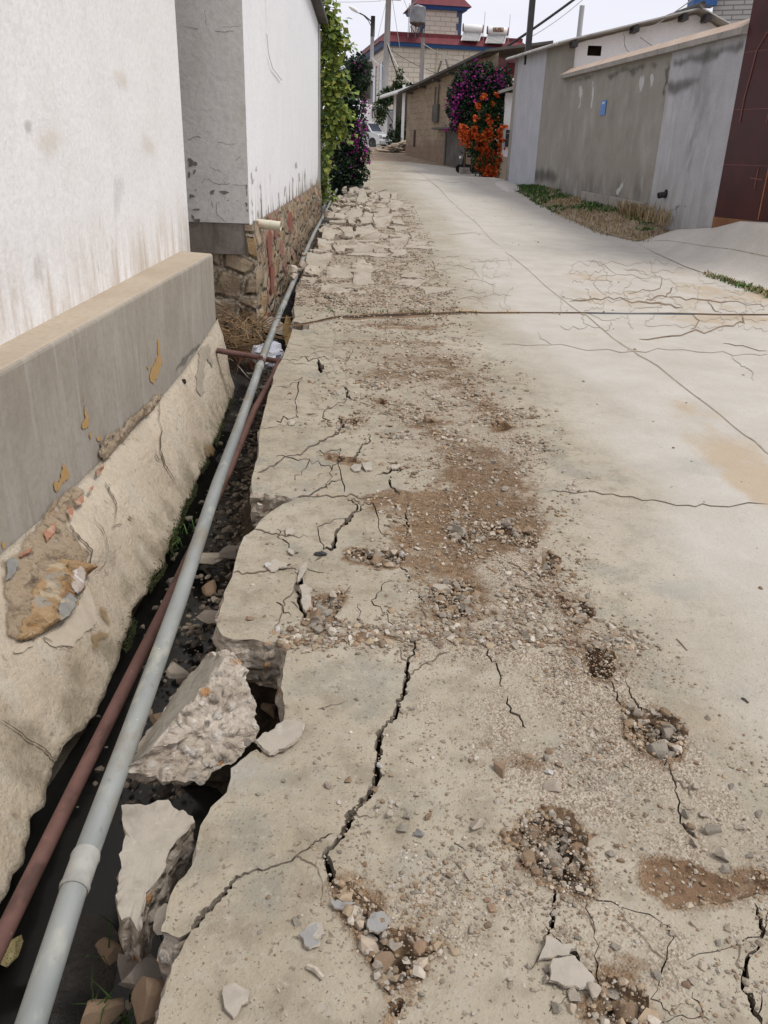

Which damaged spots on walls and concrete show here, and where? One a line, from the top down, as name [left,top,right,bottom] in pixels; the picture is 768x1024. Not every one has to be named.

crack [512,259,767,376]
spalling [2,339,162,640]
crack [551,490,765,507]
crack [191,232,511,930]
crack [529,889,768,1024]